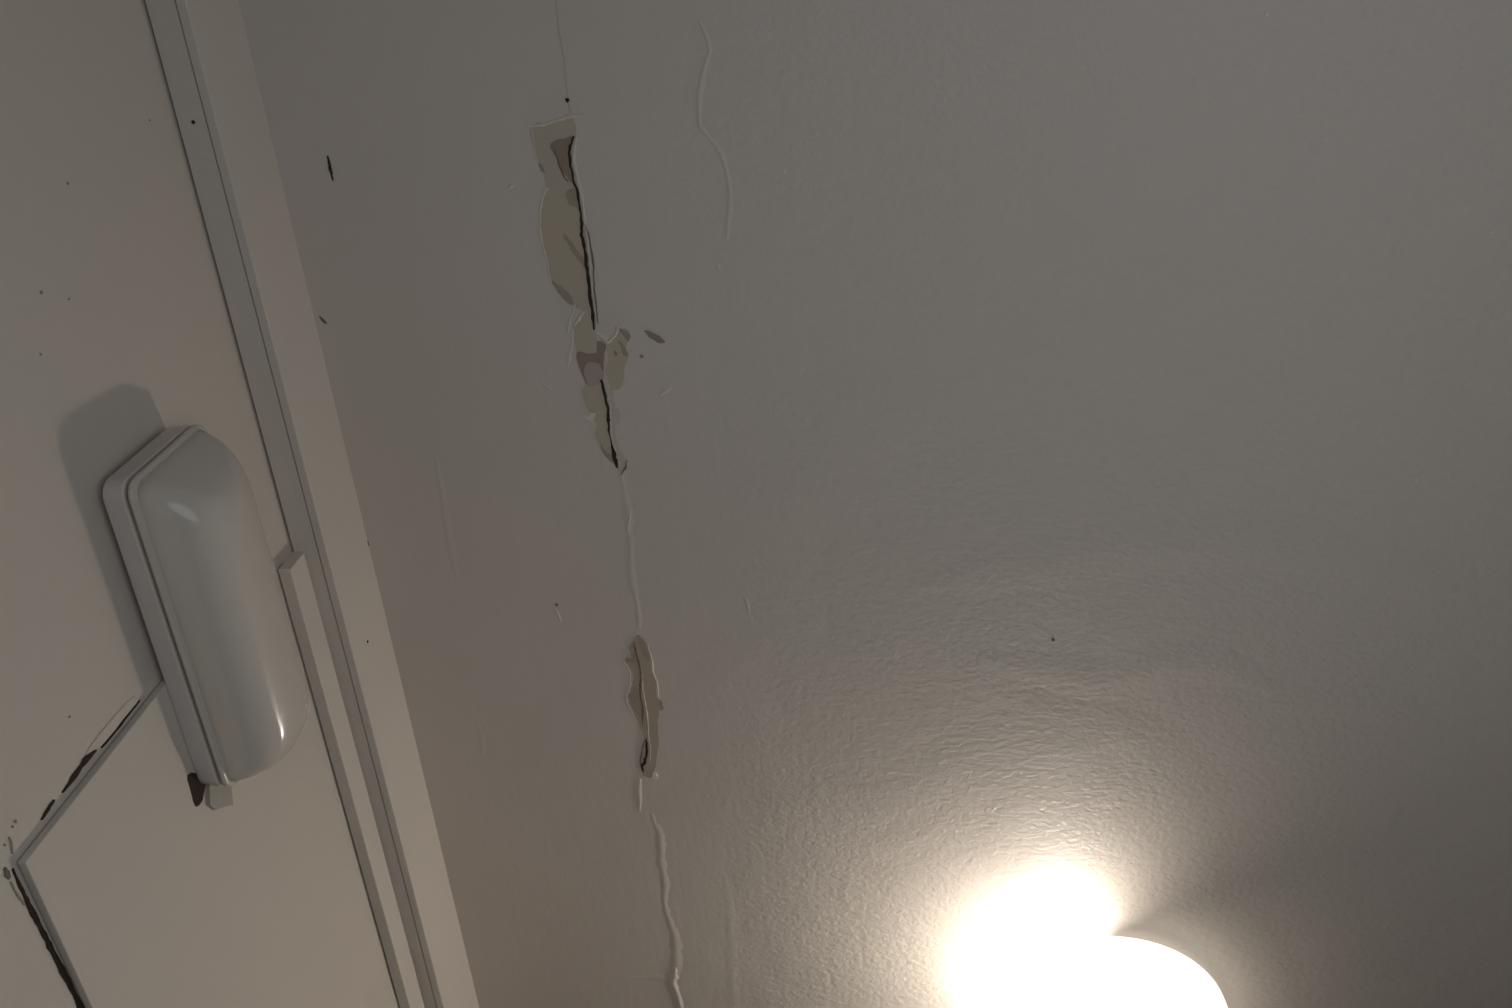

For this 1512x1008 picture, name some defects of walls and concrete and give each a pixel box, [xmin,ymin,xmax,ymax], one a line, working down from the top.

crack [554,0,598,330]
peeling [530,118,665,475]
crack [600,379,627,475]
crack [8,700,141,1008]
crack [633,642,648,772]
spalling [625,635,665,780]